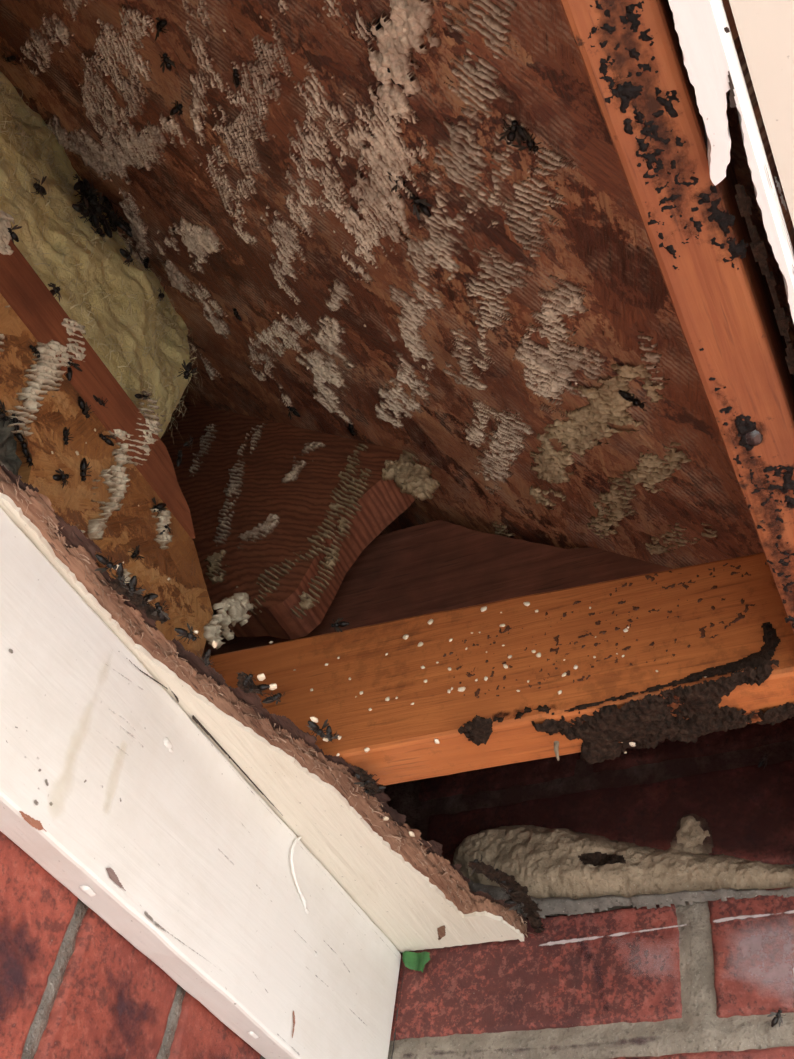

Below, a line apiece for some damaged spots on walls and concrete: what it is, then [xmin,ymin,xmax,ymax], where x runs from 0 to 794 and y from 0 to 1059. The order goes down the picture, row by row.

water stain [588,0,749,271]
water stain [718,406,794,628]
peeling [106,867,126,891]